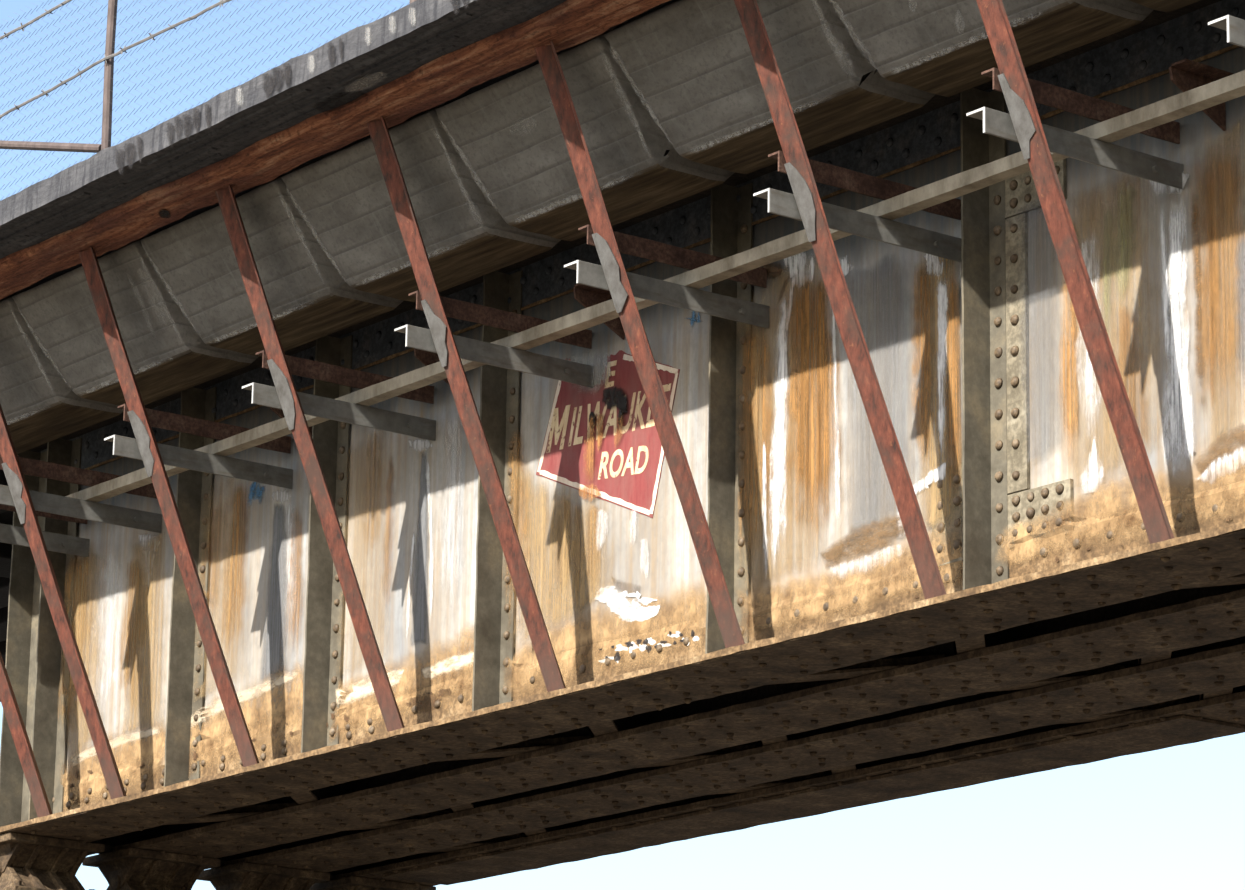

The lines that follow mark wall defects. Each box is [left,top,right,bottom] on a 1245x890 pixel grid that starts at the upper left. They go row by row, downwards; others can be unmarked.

rust [1192,204,1204,376]
rust [66,557,97,692]
rust [59,658,106,805]
rust [508,645,541,690]
rust [509,387,706,681]
peeling [594,586,660,621]
peeling [599,630,699,663]
rust [741,263,839,568]
rust [742,517,921,633]
rust [915,256,963,580]
rust [1002,481,1145,563]
rust [1157,425,1245,528]